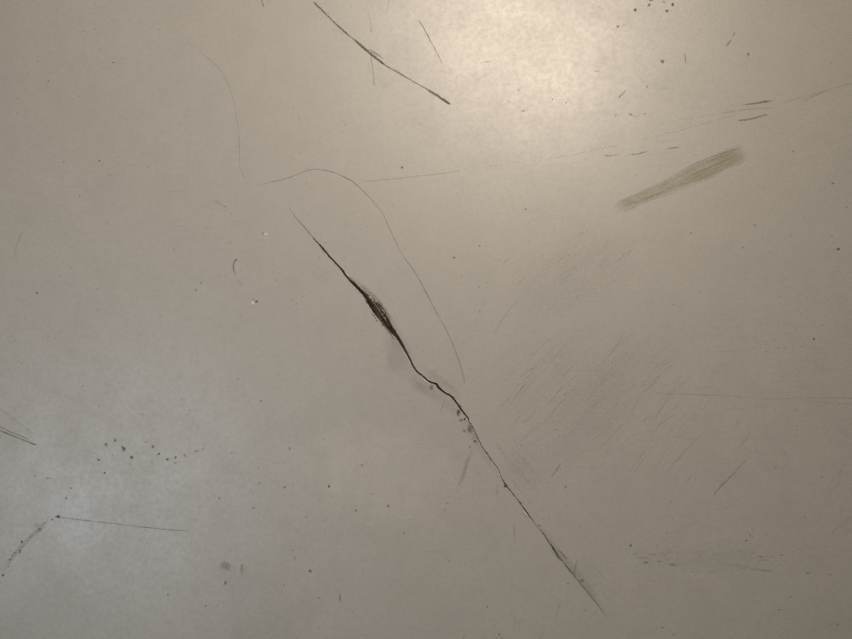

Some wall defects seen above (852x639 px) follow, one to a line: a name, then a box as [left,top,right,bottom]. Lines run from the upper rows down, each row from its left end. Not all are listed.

crack [306,229,571,571]